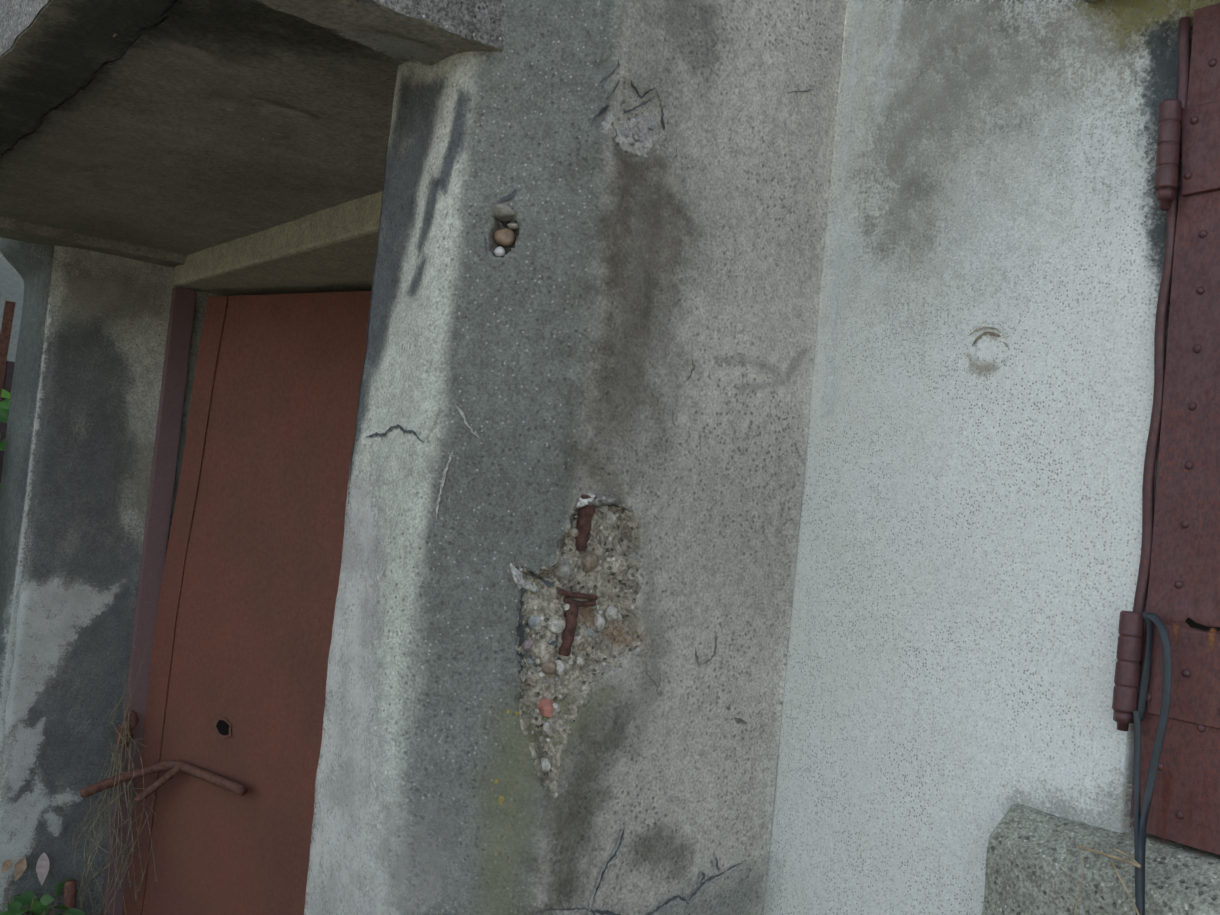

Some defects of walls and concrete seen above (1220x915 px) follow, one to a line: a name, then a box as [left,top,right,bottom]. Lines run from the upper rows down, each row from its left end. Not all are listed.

spalling [591,59,665,163]
spalling [484,188,520,257]
water stain [304,80,466,915]
crack [365,405,480,519]
water stain [0,307,141,915]
spalling [510,492,643,798]
crack [535,825,745,915]